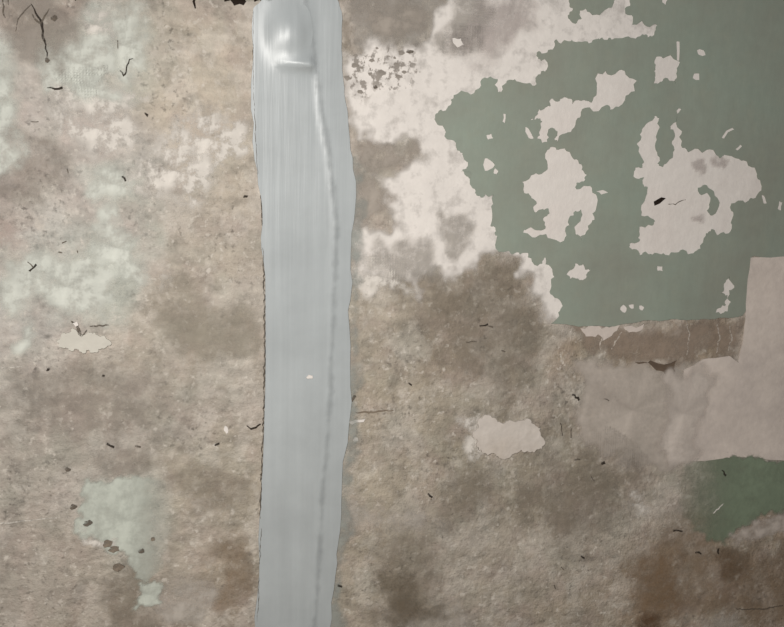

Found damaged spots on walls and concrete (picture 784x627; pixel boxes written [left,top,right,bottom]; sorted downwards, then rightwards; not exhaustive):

leakage [13,12,145,157]
peeling [654,41,680,84]
leakage [0,103,19,173]
peeling [344,0,657,320]
peeling [629,108,766,255]
leakage [93,205,146,284]
leakage [352,256,408,298]
peeling [716,279,734,314]
leakage [13,328,31,354]
peeling [57,321,112,353]
peeling [459,414,545,460]
peeling [70,476,163,609]